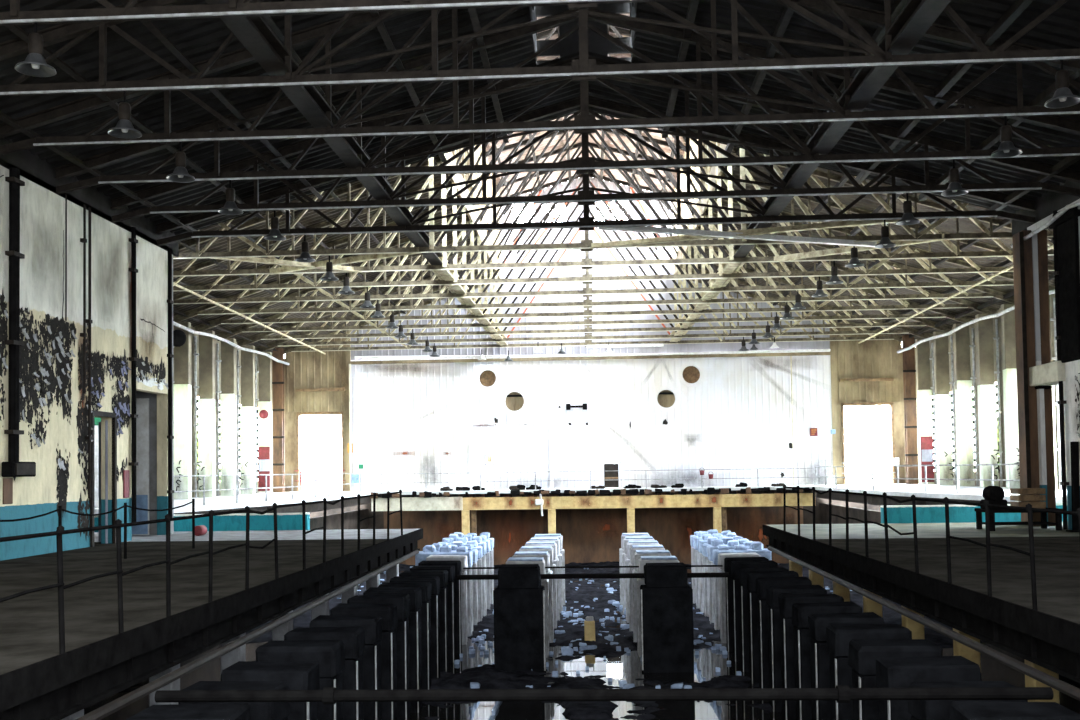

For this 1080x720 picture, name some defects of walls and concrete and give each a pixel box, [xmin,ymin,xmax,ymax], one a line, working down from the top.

peeling [0,290,169,538]